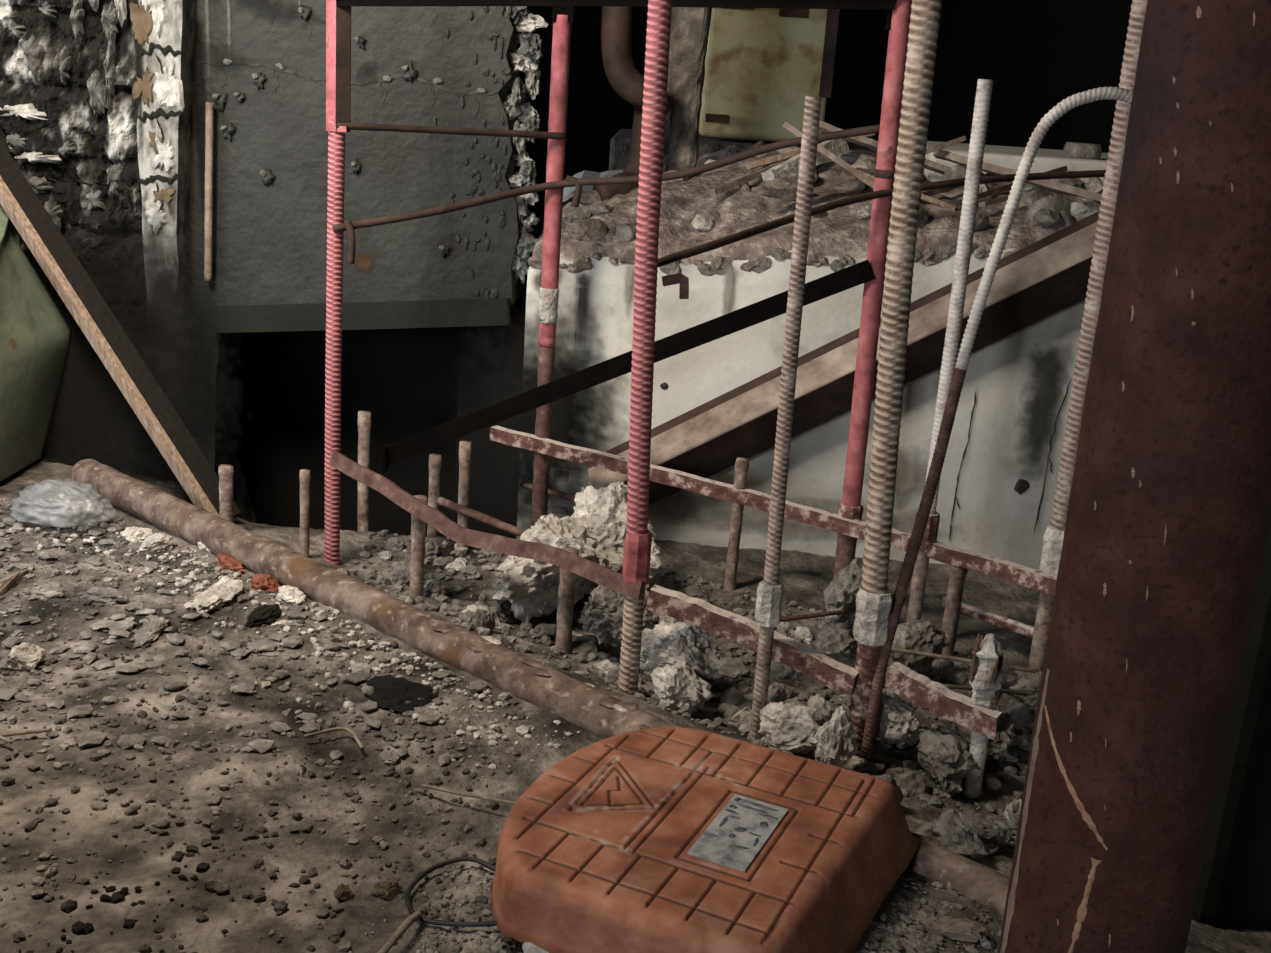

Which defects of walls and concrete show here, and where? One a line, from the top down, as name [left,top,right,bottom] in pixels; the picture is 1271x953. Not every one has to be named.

spalling [0,0,184,313]
spalling [447,6,548,284]
spalling [560,248,636,273]
spalling [659,247,792,276]
spalling [807,252,855,272]
spalling [914,241,1026,266]
damp [1021,348,1063,464]